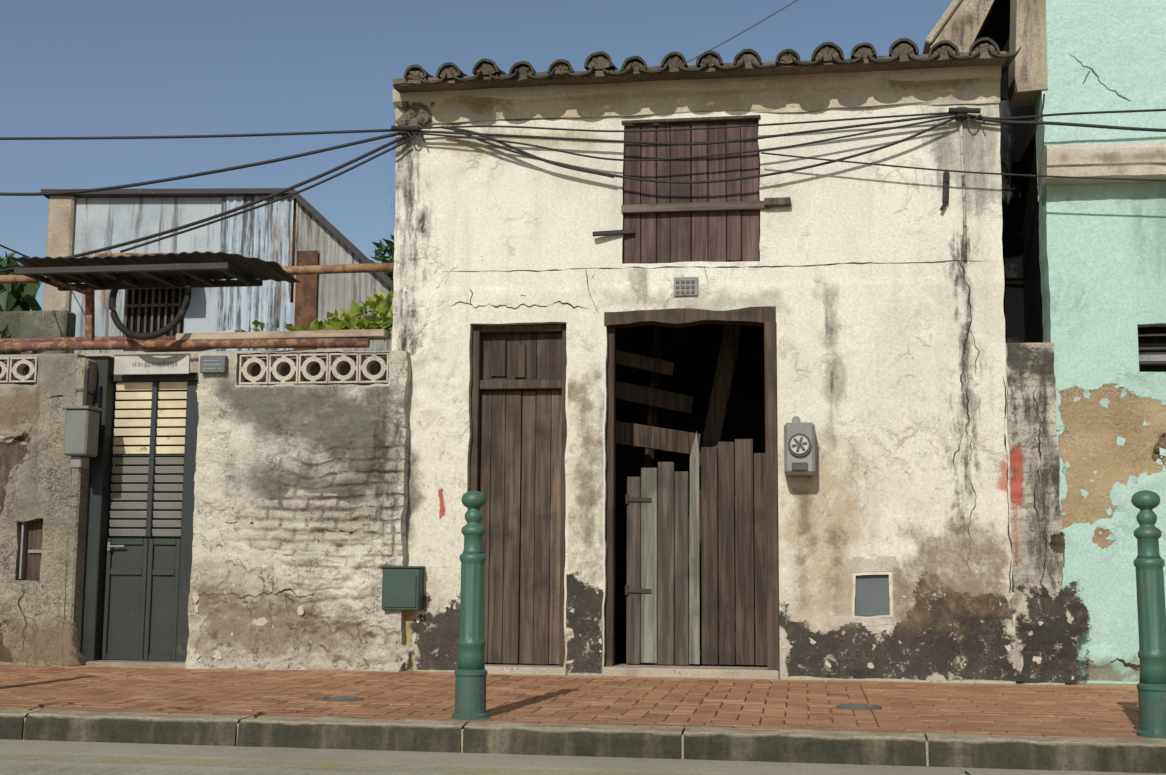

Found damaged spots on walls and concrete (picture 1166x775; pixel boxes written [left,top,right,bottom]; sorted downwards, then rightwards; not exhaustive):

crack [443,262,873,311]
flaking render [0,620,13,662]
flaking render [0,433,31,513]
flaking render [192,484,460,671]
crack [904,229,980,570]
water stain [893,513,1017,624]
crack [1003,378,1058,640]
water stain [1007,339,1061,583]
peeling [1050,382,1166,553]